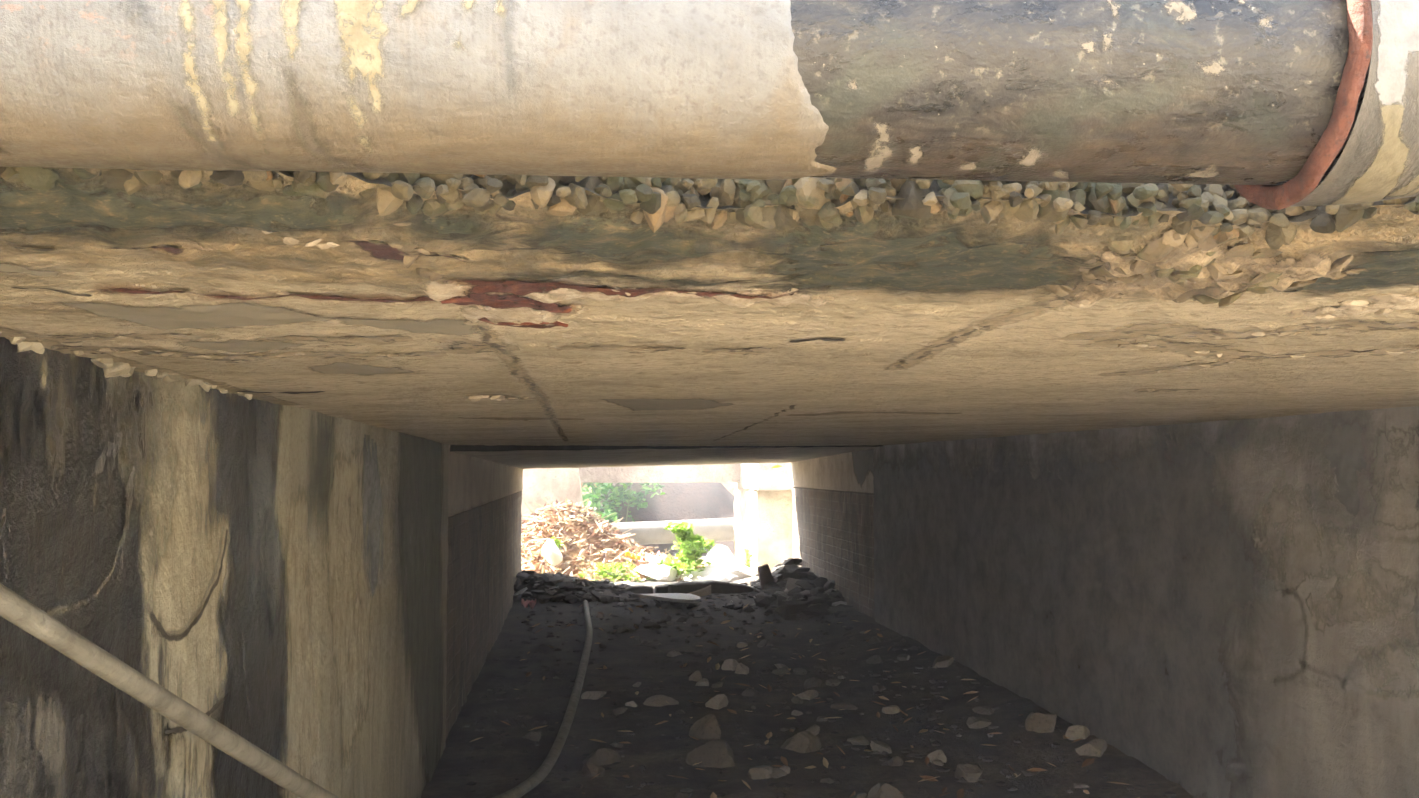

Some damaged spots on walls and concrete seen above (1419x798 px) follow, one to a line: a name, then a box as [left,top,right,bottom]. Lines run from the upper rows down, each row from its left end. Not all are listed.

spalling [0,123,1419,308]
damp [63,303,477,353]
crack [465,324,568,441]
spalling [262,231,835,329]
crack [886,293,1070,370]
peeling [1184,336,1223,369]
spalling [1286,291,1419,331]
crack [714,405,795,441]
damp [0,337,443,798]